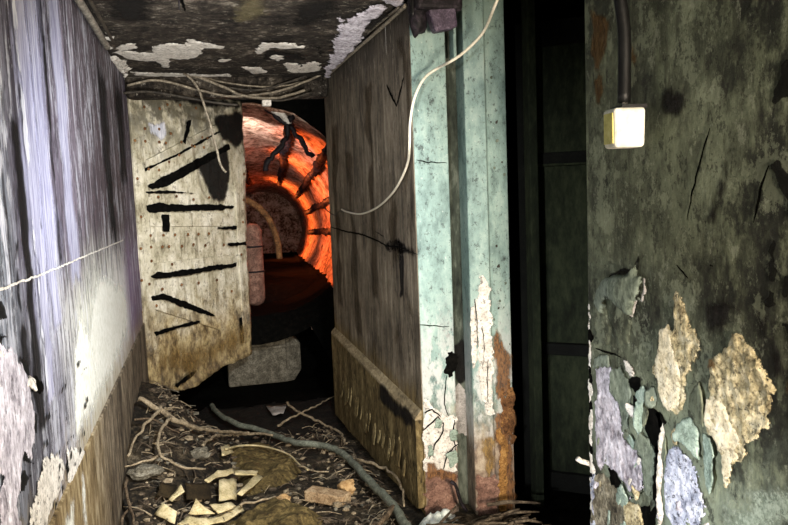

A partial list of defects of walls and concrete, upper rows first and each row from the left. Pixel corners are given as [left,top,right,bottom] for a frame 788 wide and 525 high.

peeling [105,33,231,78]
peeling [241,0,405,78]
crack [332,227,418,255]
peeling [0,334,85,525]
peeling [422,351,467,472]
peeling [470,275,495,416]
rust [482,332,516,512]
peeling [588,291,776,525]